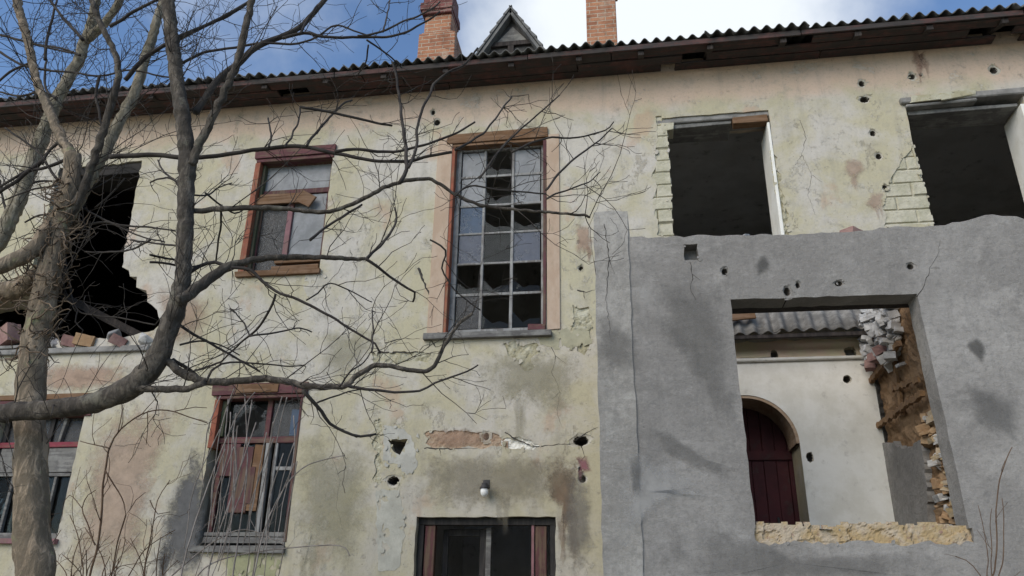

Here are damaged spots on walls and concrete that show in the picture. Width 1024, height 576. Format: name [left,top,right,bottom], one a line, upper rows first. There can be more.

peeling [502,305,593,371]
damp [970,341,982,358]
spalling [499,434,541,454]
crack [505,428,595,459]
damp [159,459,203,570]
peeling [371,418,433,571]